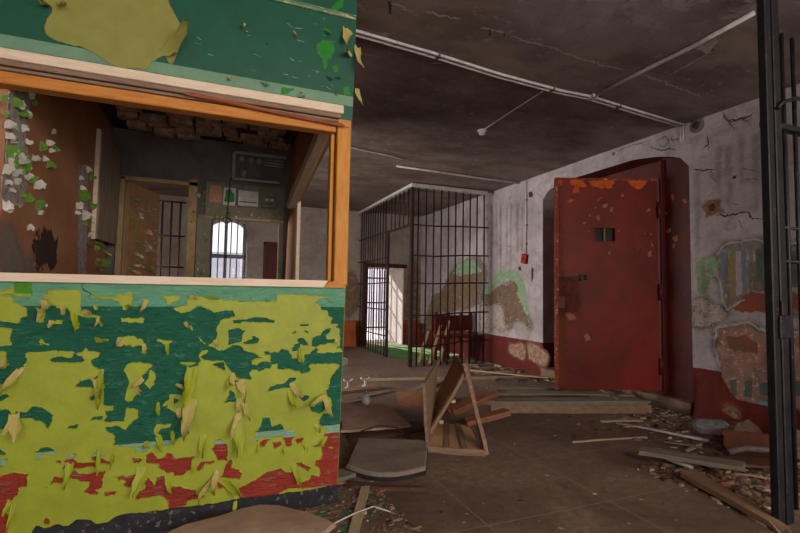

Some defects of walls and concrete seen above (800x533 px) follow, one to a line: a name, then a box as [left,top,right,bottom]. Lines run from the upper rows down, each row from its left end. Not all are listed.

peeling [37,0,189,70]
peeling [343,26,364,68]
crack [651,136,679,151]
crack [694,136,719,183]
crack [723,113,753,131]
crack [717,204,759,231]
peeling [0,90,345,511]
flaking render [423,256,534,334]
flaking render [693,238,768,420]
peeling [508,343,549,367]
peeling [0,449,30,533]